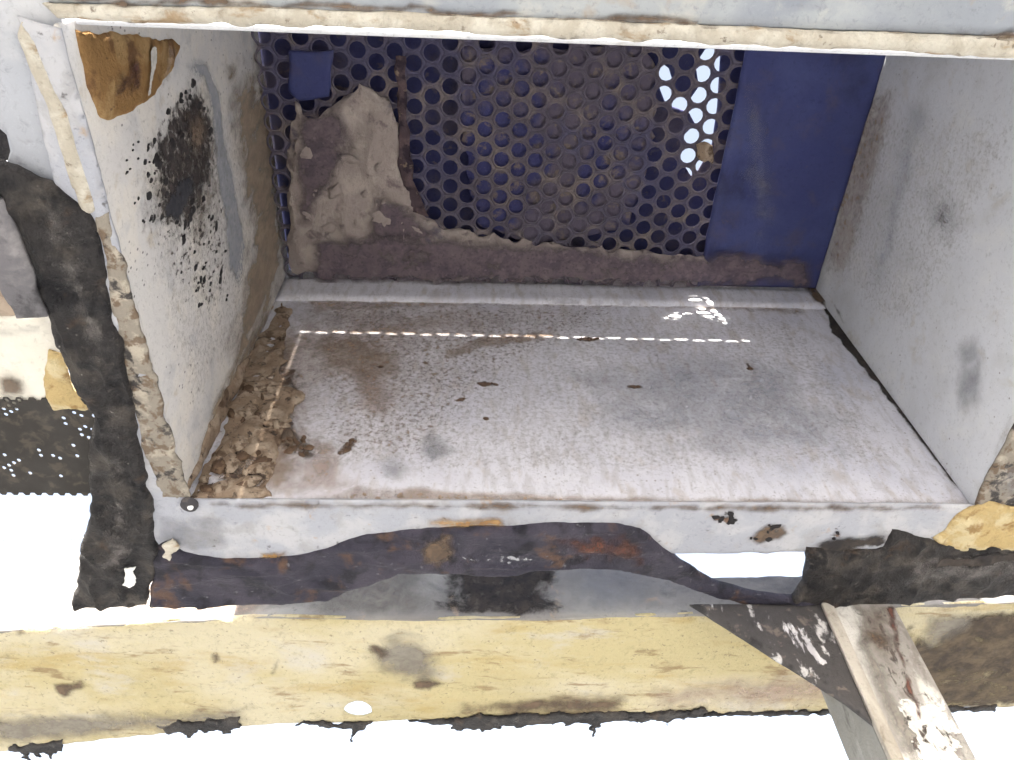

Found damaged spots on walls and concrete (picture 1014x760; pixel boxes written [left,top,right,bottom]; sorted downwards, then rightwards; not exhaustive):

leakage [125,65,245,308]
rust [187,77,329,508]
rust [319,301,603,457]
rust [343,491,610,563]
rust [680,501,812,511]